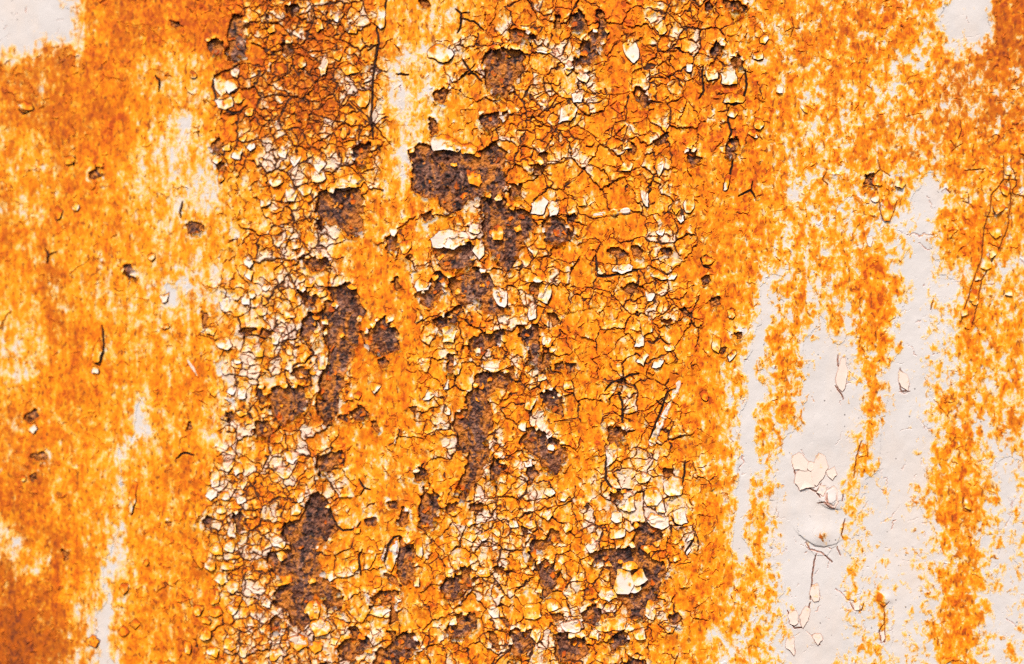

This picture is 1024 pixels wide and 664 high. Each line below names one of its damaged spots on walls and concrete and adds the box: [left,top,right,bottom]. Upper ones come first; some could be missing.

corrosion [604,0,637,82]
corrosion [0,0,257,664]
peeling [268,450,345,638]
peeling [250,283,400,442]
corrosion [318,0,479,616]
peeling [335,366,515,664]
crack [178,0,755,664]
peeling [409,29,576,378]
peeling [519,425,567,483]
corrosion [566,314,604,481]
peeling [584,522,666,664]
corrosion [666,0,1024,664]